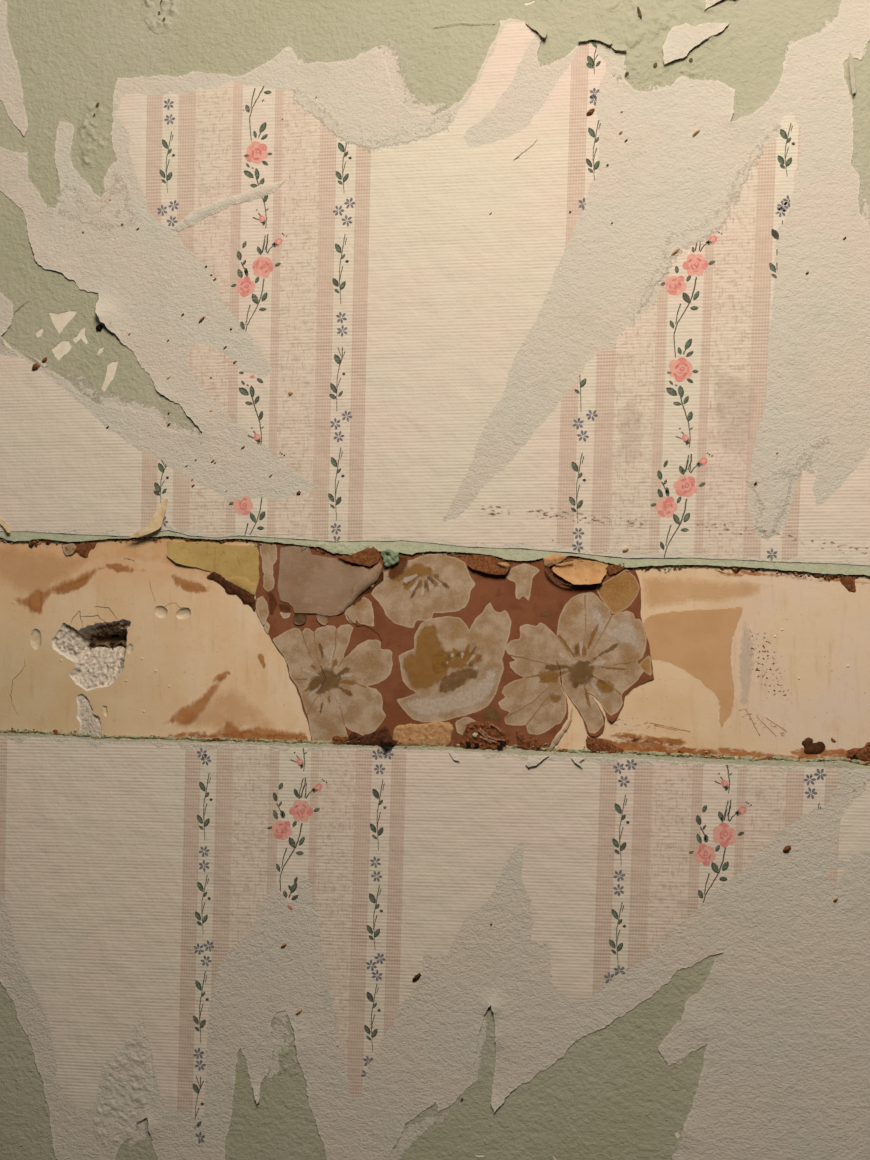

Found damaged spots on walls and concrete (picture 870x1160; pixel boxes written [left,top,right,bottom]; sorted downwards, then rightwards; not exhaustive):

peeling [141,0,181,35]
peeling [578,33,627,51]
peeling [36,311,118,391]
peeling [306,541,370,555]
damp [18,571,94,612]
damp [174,577,206,592]
damp [643,582,787,726]
flaking render [51,619,131,739]
damp [169,672,307,742]